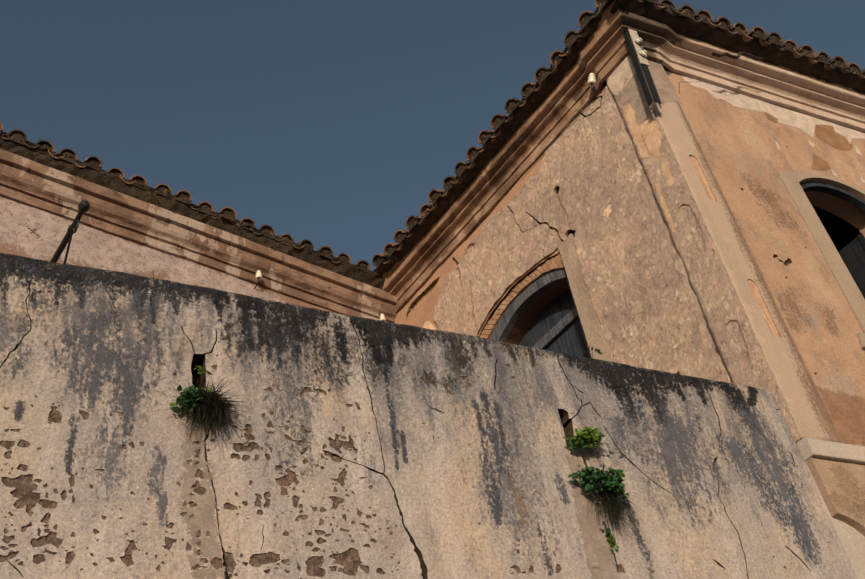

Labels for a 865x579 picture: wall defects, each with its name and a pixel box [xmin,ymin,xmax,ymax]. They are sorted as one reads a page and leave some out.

peeling [622,103,675,232]
peeling [681,75,865,184]
spalling [0,429,84,568]
water stain [0,264,190,506]
crack [203,421,231,579]
spalling [86,411,400,579]
crack [323,323,428,579]
water stain [383,369,408,471]
water stain [420,337,555,576]
crack [557,354,672,494]
water stain [607,398,822,579]
crack [709,394,749,579]